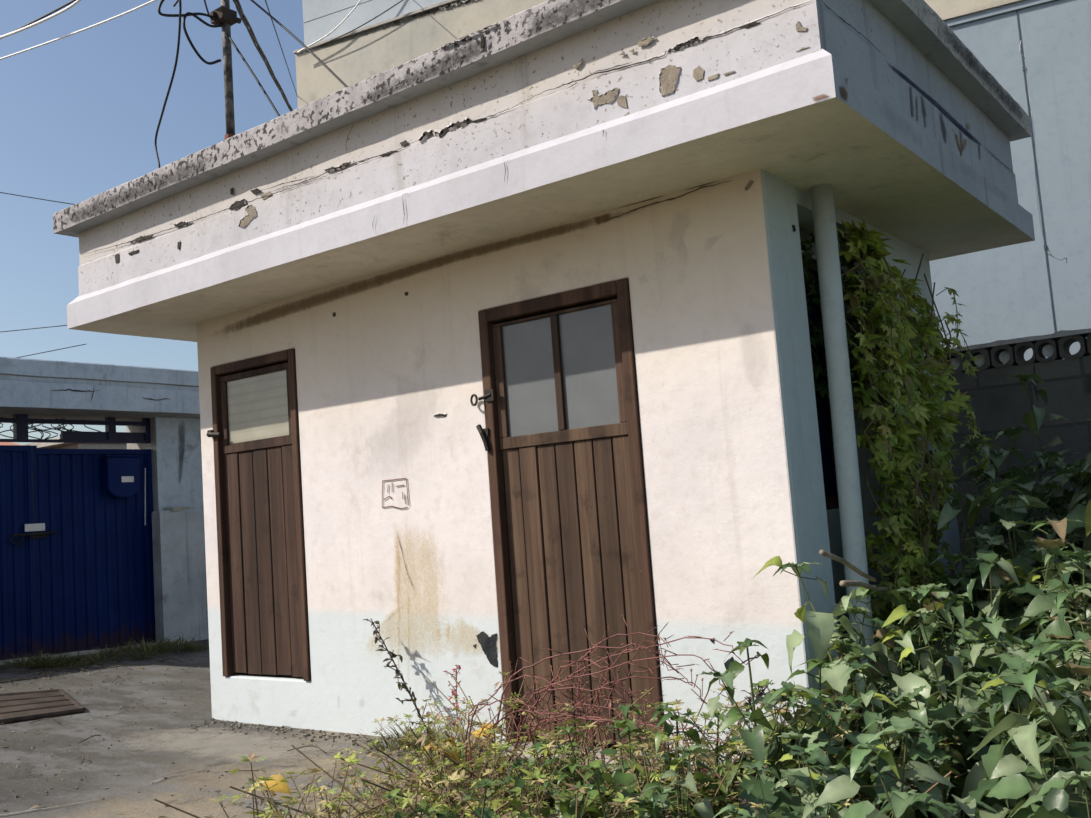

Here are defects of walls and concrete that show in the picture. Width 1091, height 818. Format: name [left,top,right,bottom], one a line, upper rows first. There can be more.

damp [528,0,603,34]
damp [363,38,490,100]
peeling [588,88,628,109]
crack [474,0,886,121]
spalling [666,36,703,52]
peeling [659,65,735,96]
crack [90,126,416,253]
spalling [473,631,498,667]